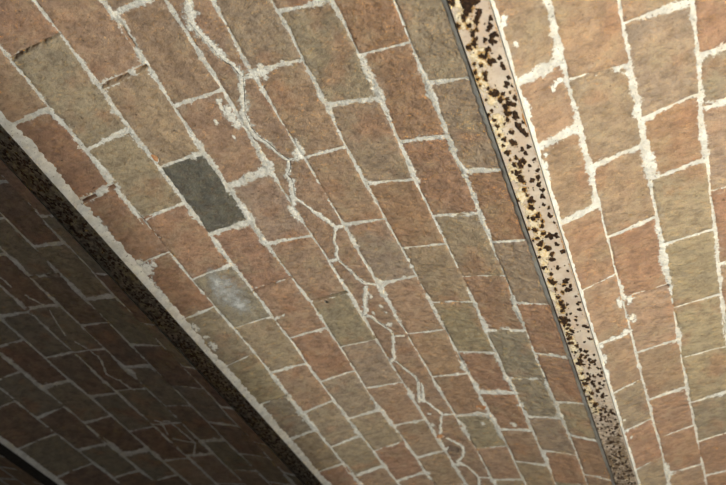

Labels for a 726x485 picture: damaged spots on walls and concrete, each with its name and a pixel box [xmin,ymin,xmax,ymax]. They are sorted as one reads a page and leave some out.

efflorescence [210,277,249,311]
crack [182,0,490,485]
rust [448,0,637,485]